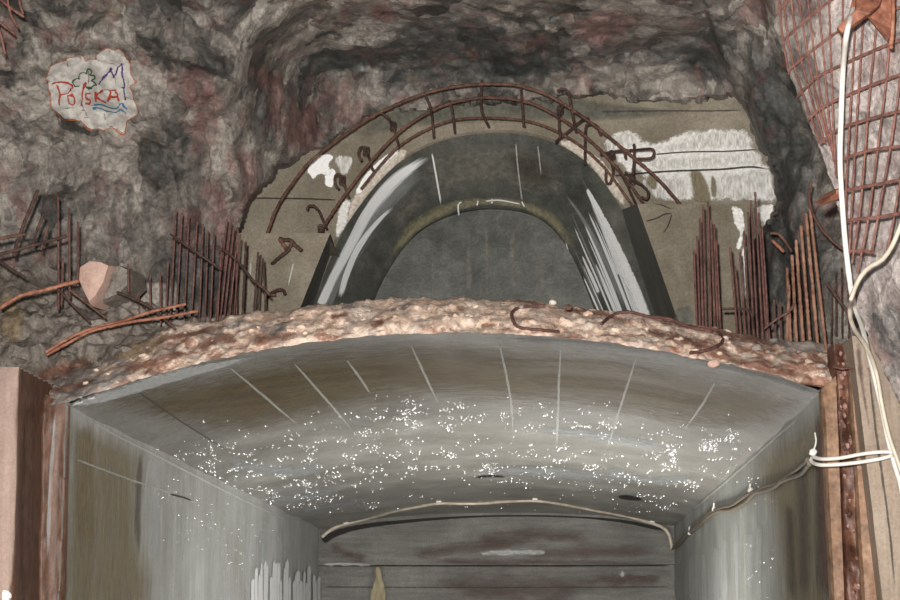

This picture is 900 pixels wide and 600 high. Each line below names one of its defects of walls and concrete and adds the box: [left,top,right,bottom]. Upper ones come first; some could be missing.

spalling [0,79,850,408]
damp [318,145,564,304]
damp [691,171,716,202]